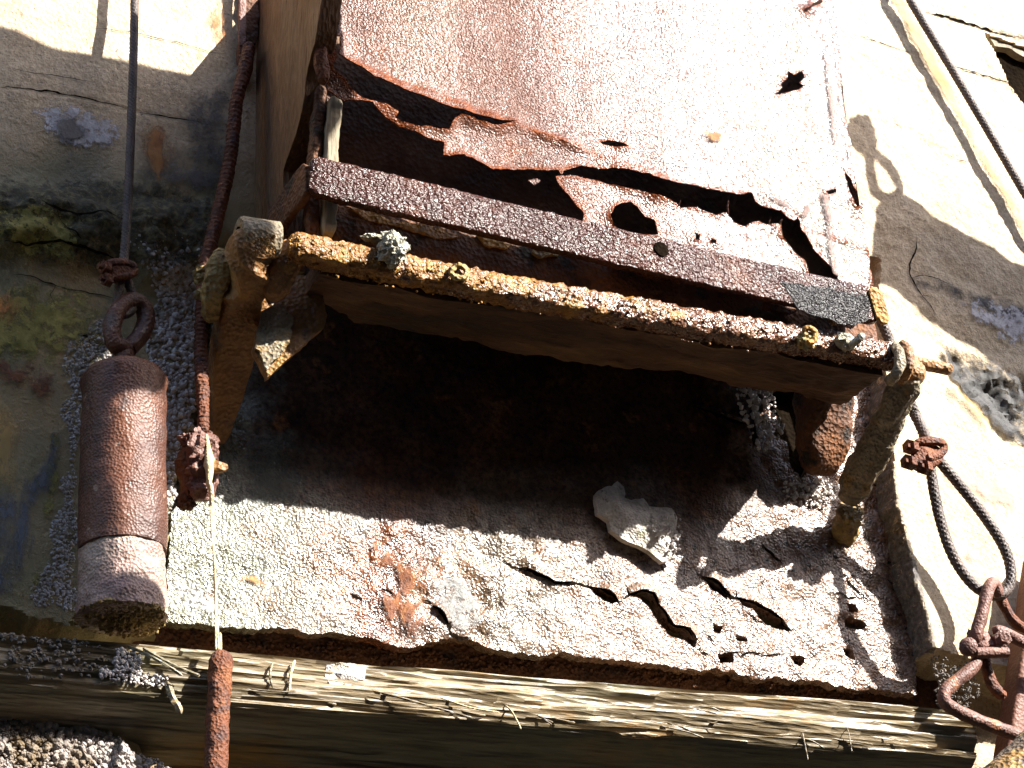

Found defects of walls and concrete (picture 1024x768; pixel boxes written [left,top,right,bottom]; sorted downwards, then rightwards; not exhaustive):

water stain [33,107,119,148]
crack [2,69,209,125]
spalling [945,350,1024,444]
rust [373,537,442,635]
crack [503,560,795,656]